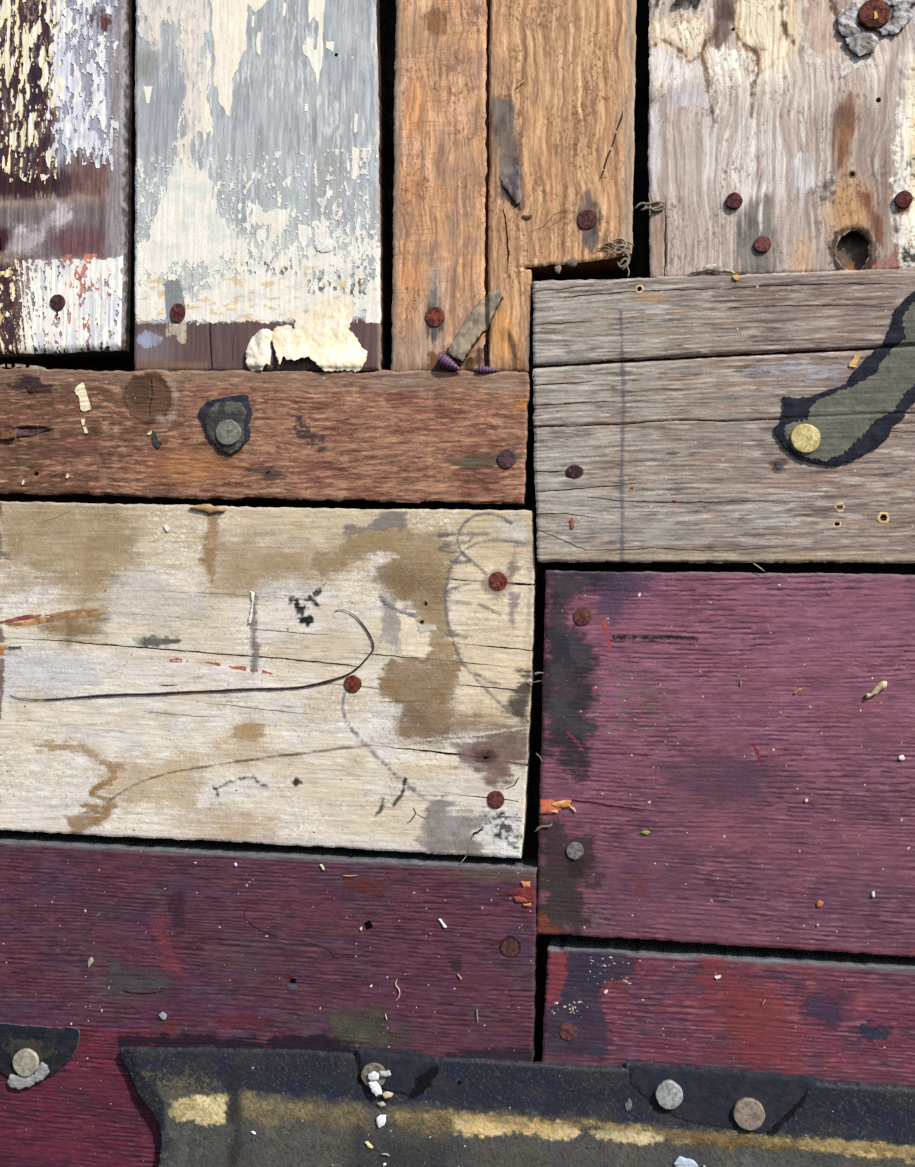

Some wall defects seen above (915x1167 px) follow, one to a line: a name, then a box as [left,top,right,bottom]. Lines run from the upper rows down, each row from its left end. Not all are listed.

peeling [799,21,880,77]
peeling [0,0,381,372]
peeling [649,102,662,193]
peeling [788,151,815,212]
peeling [872,247,901,269]
damp [199,513,654,786]